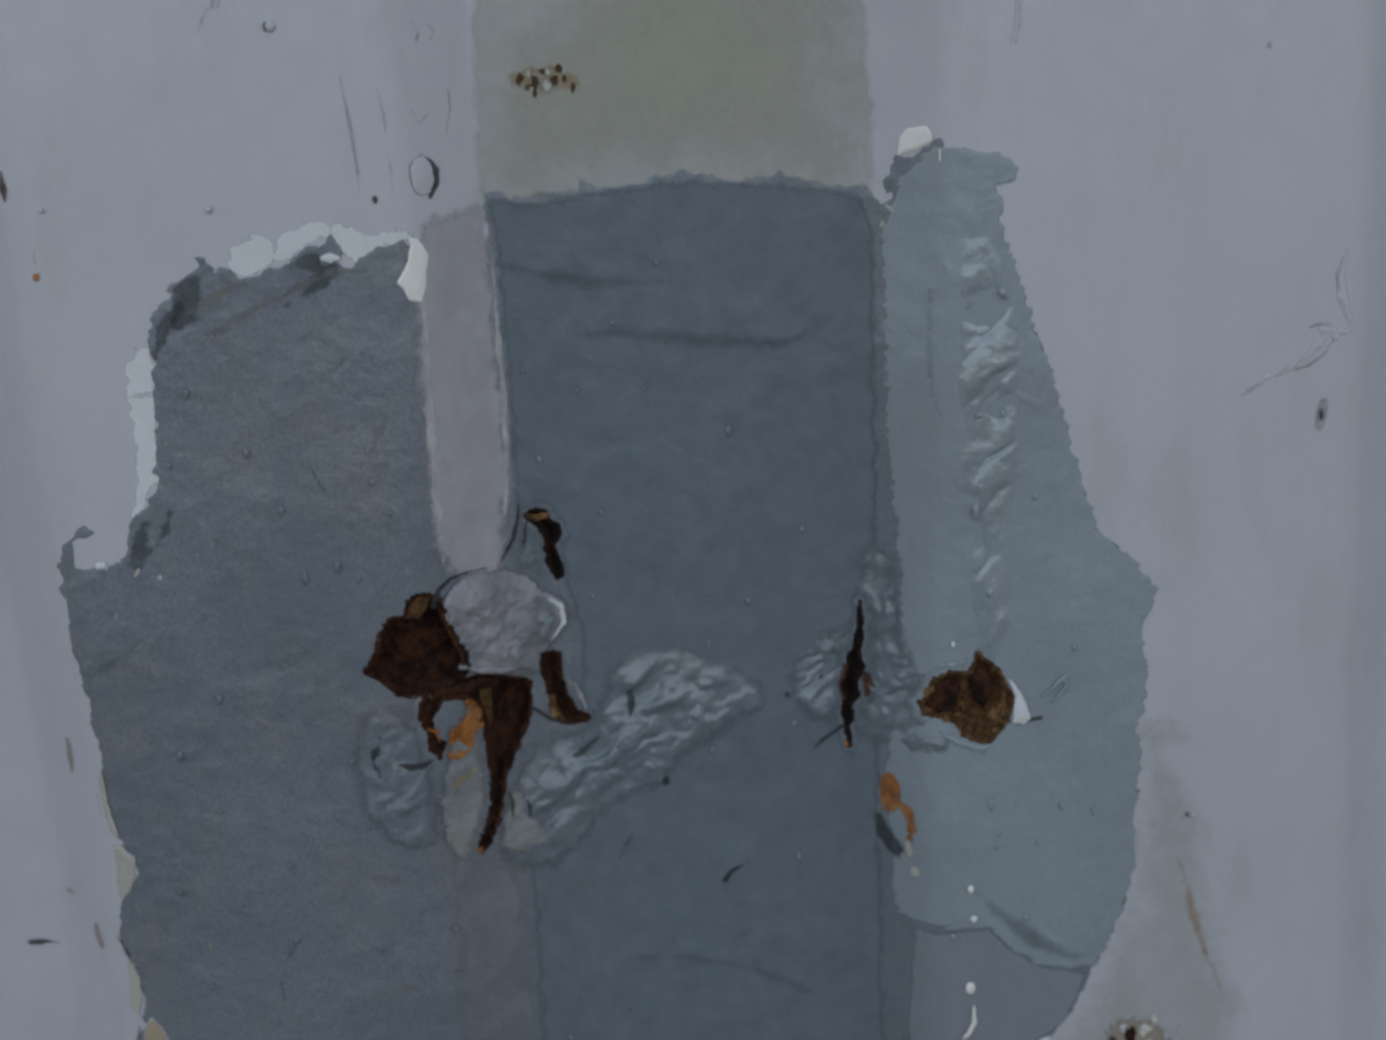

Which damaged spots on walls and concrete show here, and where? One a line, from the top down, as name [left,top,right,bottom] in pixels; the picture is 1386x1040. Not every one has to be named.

corrosion [516,64,576,97]
peeling [227,221,428,302]
peeling [125,347,159,519]
corrosion [406,595,466,665]
corrosion [427,687,493,760]
peeling [97,771,136,901]
peeling [119,939,167,1040]